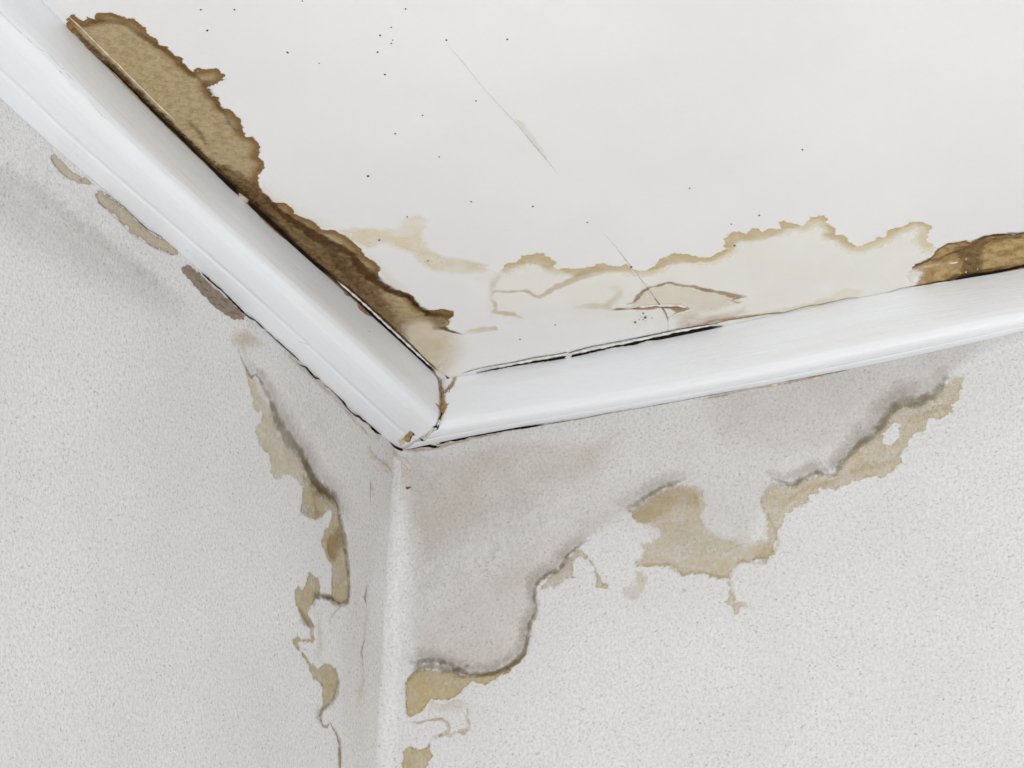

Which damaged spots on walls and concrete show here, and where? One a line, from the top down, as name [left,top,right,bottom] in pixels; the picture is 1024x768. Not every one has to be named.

peeling [51,154,178,255]
peeling [182,265,246,320]
crack [100,59,848,451]
leakage [505,216,924,274]
leakage [406,643,528,723]
leakage [402,743,433,768]